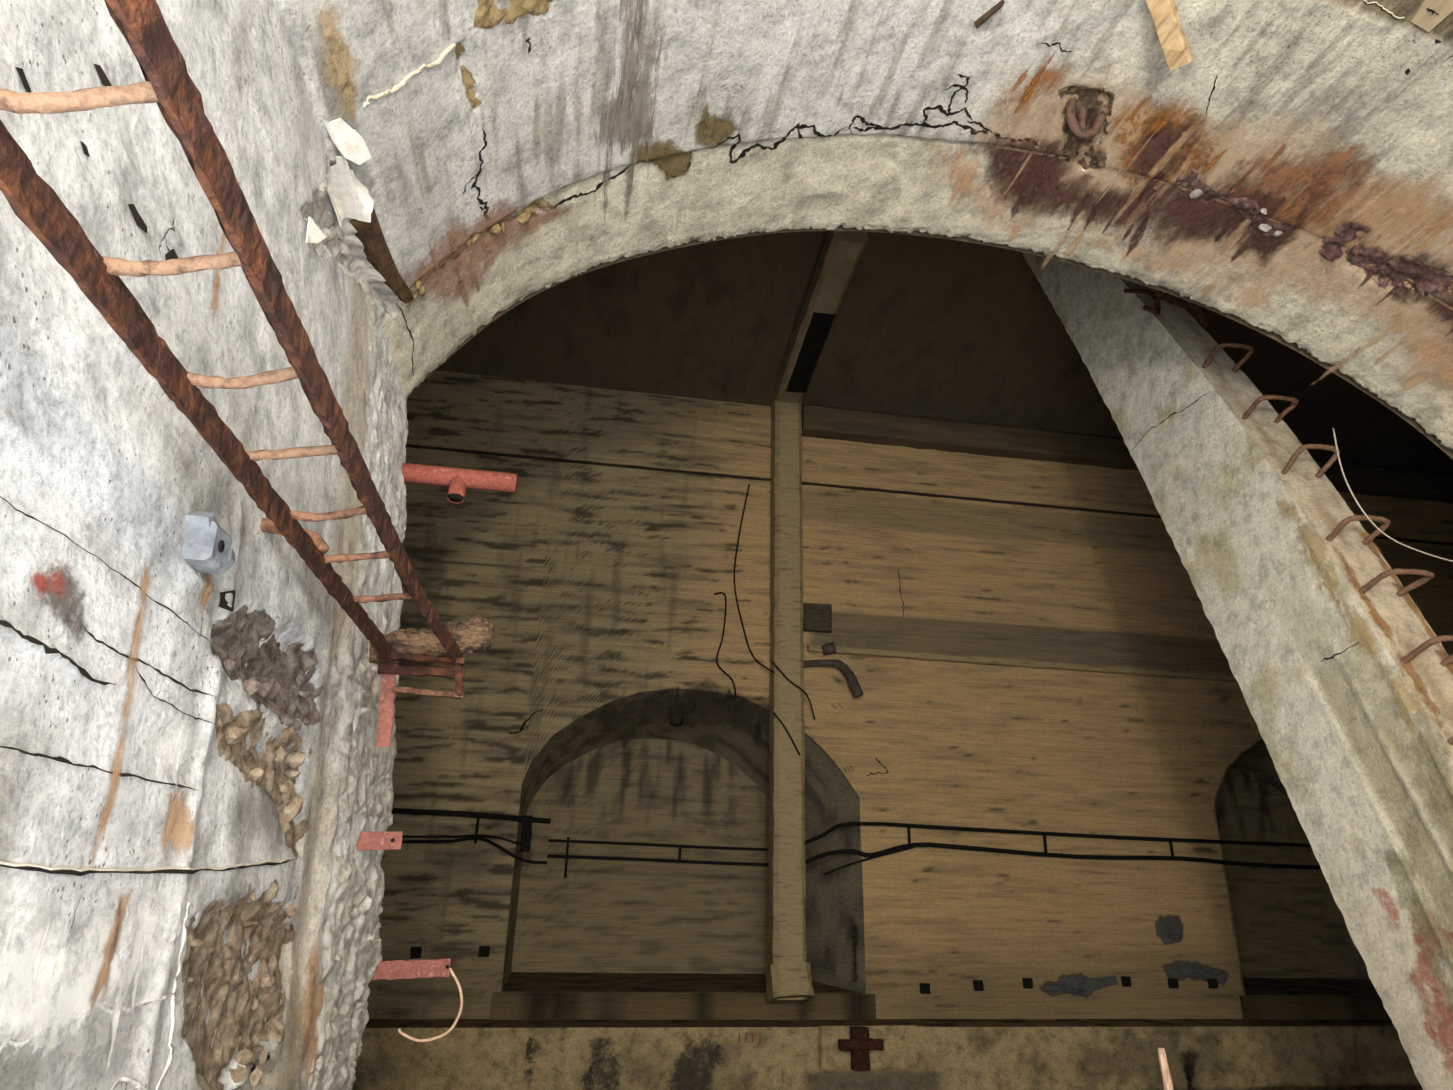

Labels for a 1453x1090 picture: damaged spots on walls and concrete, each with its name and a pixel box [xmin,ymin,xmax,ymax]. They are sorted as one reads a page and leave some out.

spalling [473,0,553,29]
spalling [455,42,482,109]
crack [463,126,490,220]
crack [533,74,1038,215]
rust [949,53,1453,389]
crack [0,620,218,724]
crack [0,746,199,791]
spalling [211,605,399,859]
spalling [181,879,299,1090]
leakage [582,1038,620,1090]
leakage [669,1040,721,1090]
leakage [1183,1053,1198,1090]